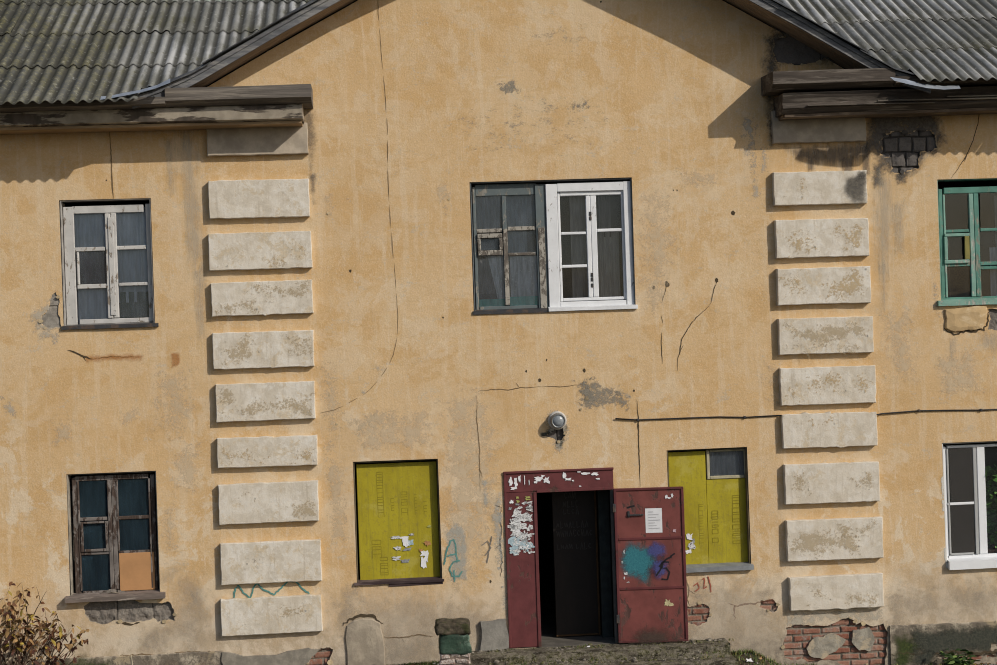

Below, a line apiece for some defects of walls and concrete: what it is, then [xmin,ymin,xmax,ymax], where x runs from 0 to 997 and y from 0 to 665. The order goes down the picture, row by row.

water stain [795,142,884,185]
flaking render [880,127,936,174]
crack [952,116,979,177]
spalling [30,292,61,344]
crack [661,283,717,370]
crack [68,350,134,360]
flaking render [84,589,177,624]
flaking render [307,647,333,665]
flaking render [687,601,712,626]
flaking render [760,600,780,612]
flaking render [781,589,887,665]
water stain [897,626,997,665]